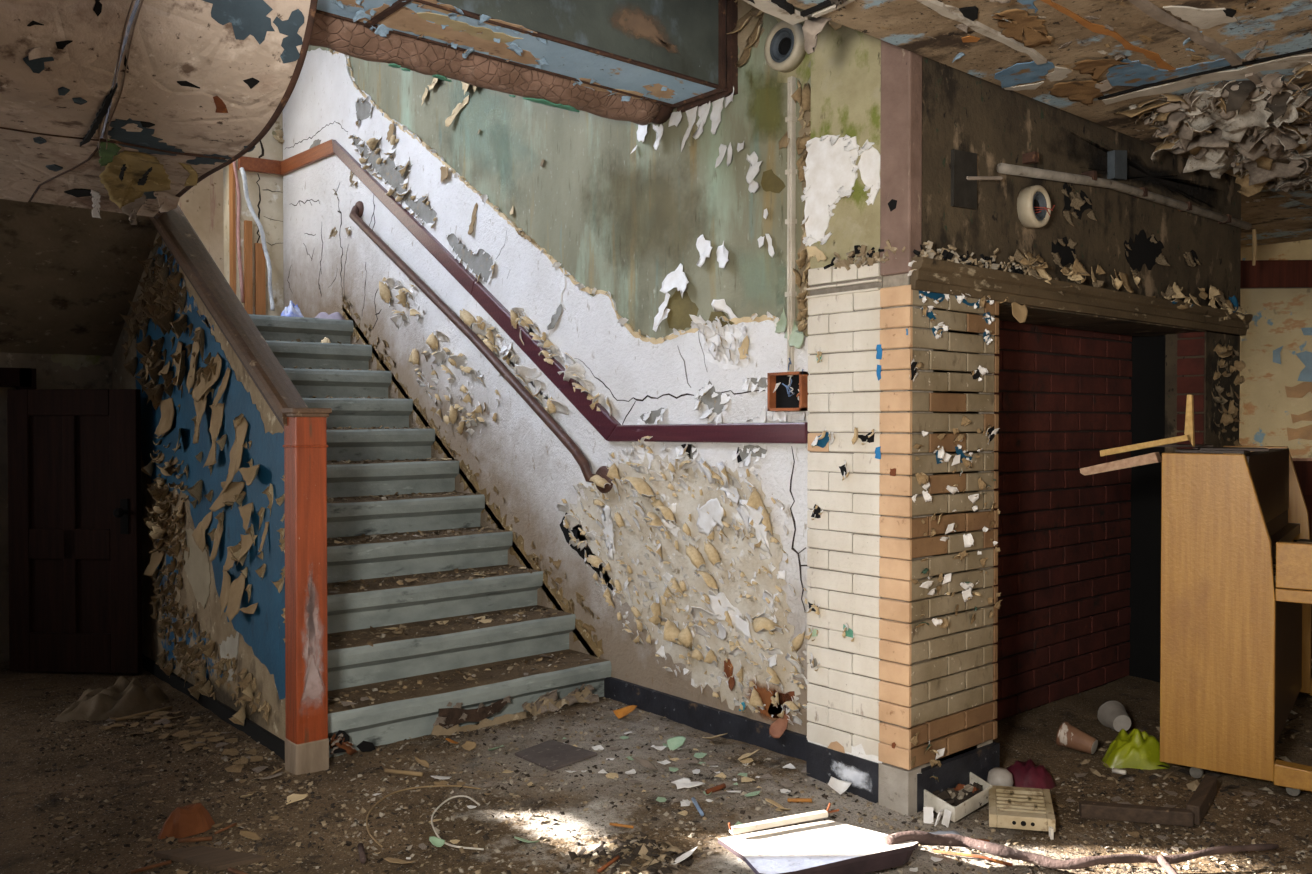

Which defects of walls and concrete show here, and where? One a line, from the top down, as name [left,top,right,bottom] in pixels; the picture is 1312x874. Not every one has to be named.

peeling [202,0,304,64]
peeling [330,0,549,69]
peeling [1113,61,1312,197]
flaking render [329,49,880,425]
flaking render [1014,182,1170,311]
peeling [341,294,611,508]
crack [574,331,765,425]
peeling [919,290,1028,345]
peeling [1211,337,1246,446]
peeling [118,236,286,726]
crack [790,446,807,611]
peeling [911,415,1002,629]